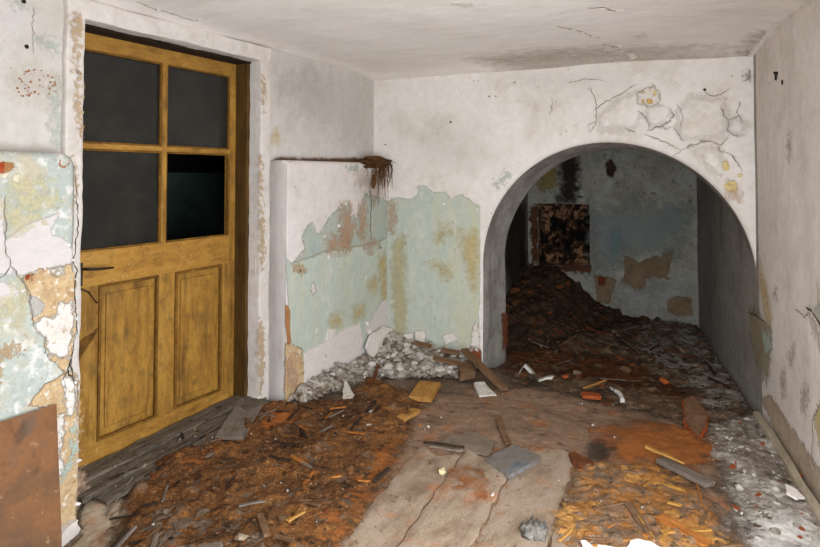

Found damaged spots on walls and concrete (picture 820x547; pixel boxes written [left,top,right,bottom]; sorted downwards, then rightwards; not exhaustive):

crack [570,79,639,129]
peeling [637,86,661,108]
crack [627,88,745,168]
peeling [0,162,21,182]
peeling [724,174,742,197]
peeling [284,185,509,402]
peeling [528,204,695,320]
crack [795,282,820,325]
flaking render [0,198,84,547]
flaking render [761,395,820,502]